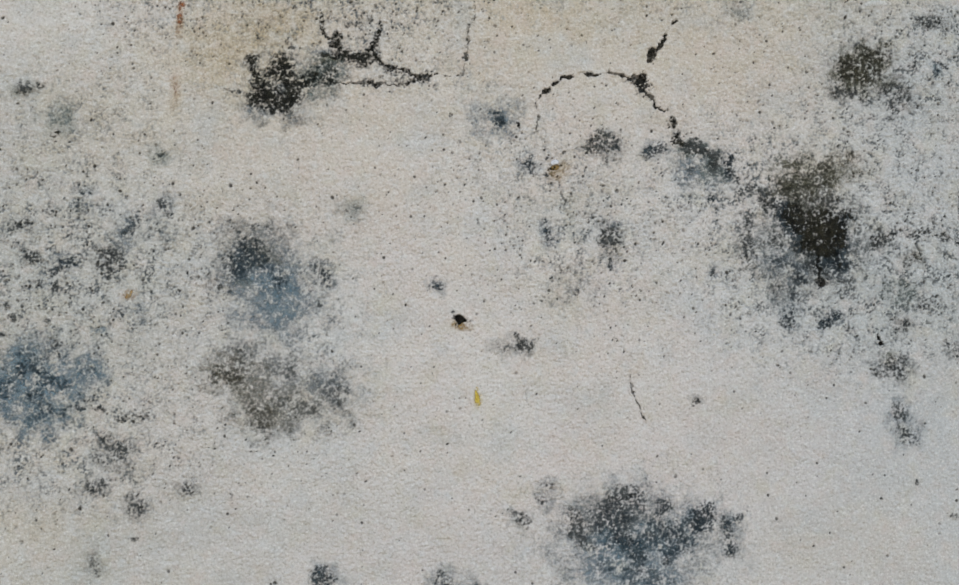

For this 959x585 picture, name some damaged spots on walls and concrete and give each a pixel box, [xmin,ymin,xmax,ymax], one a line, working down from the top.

crack [341,1,476,88]
crack [535,6,698,130]
mould [832,42,910,121]
mould [643,116,858,301]
mould [218,225,321,329]
mould [0,340,104,439]
mould [214,350,343,432]
mould [567,486,743,585]